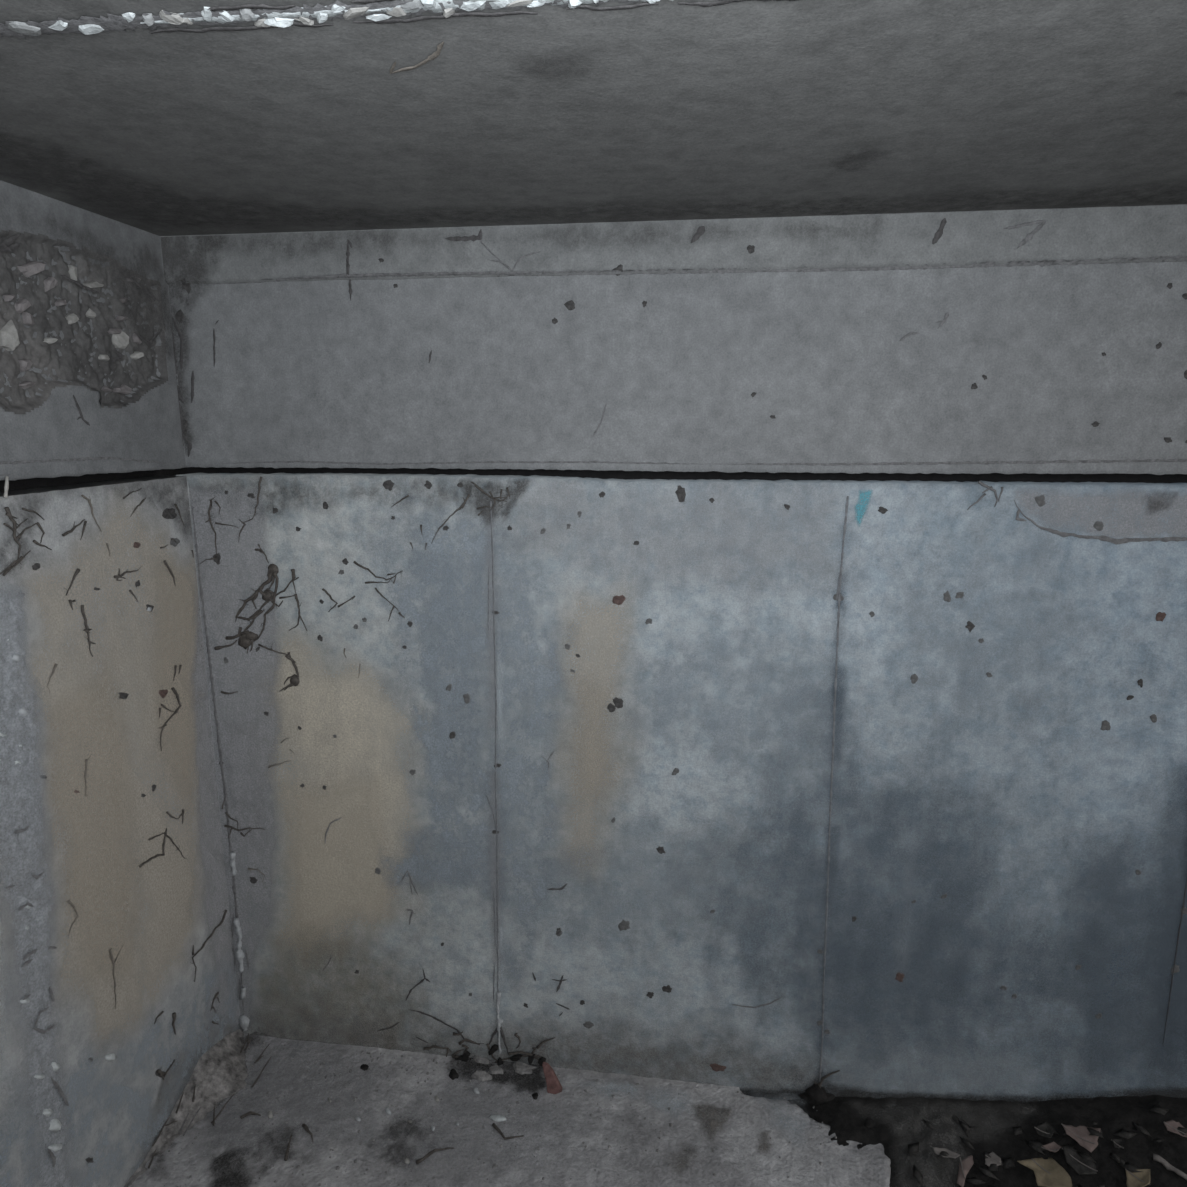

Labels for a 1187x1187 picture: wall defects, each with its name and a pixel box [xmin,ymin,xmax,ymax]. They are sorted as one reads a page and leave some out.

crack [150,0,538,74]
crack [566,0,797,11]
spalling [0,230,184,414]
crack [732,458,1187,466]
crack [1014,500,1187,544]
damp [0,490,285,1187]
damp [386,513,560,947]
crack [485,501,499,1002]
crack [819,496,849,1082]
damp [489,927,717,1093]
crack [1162,875,1187,1043]